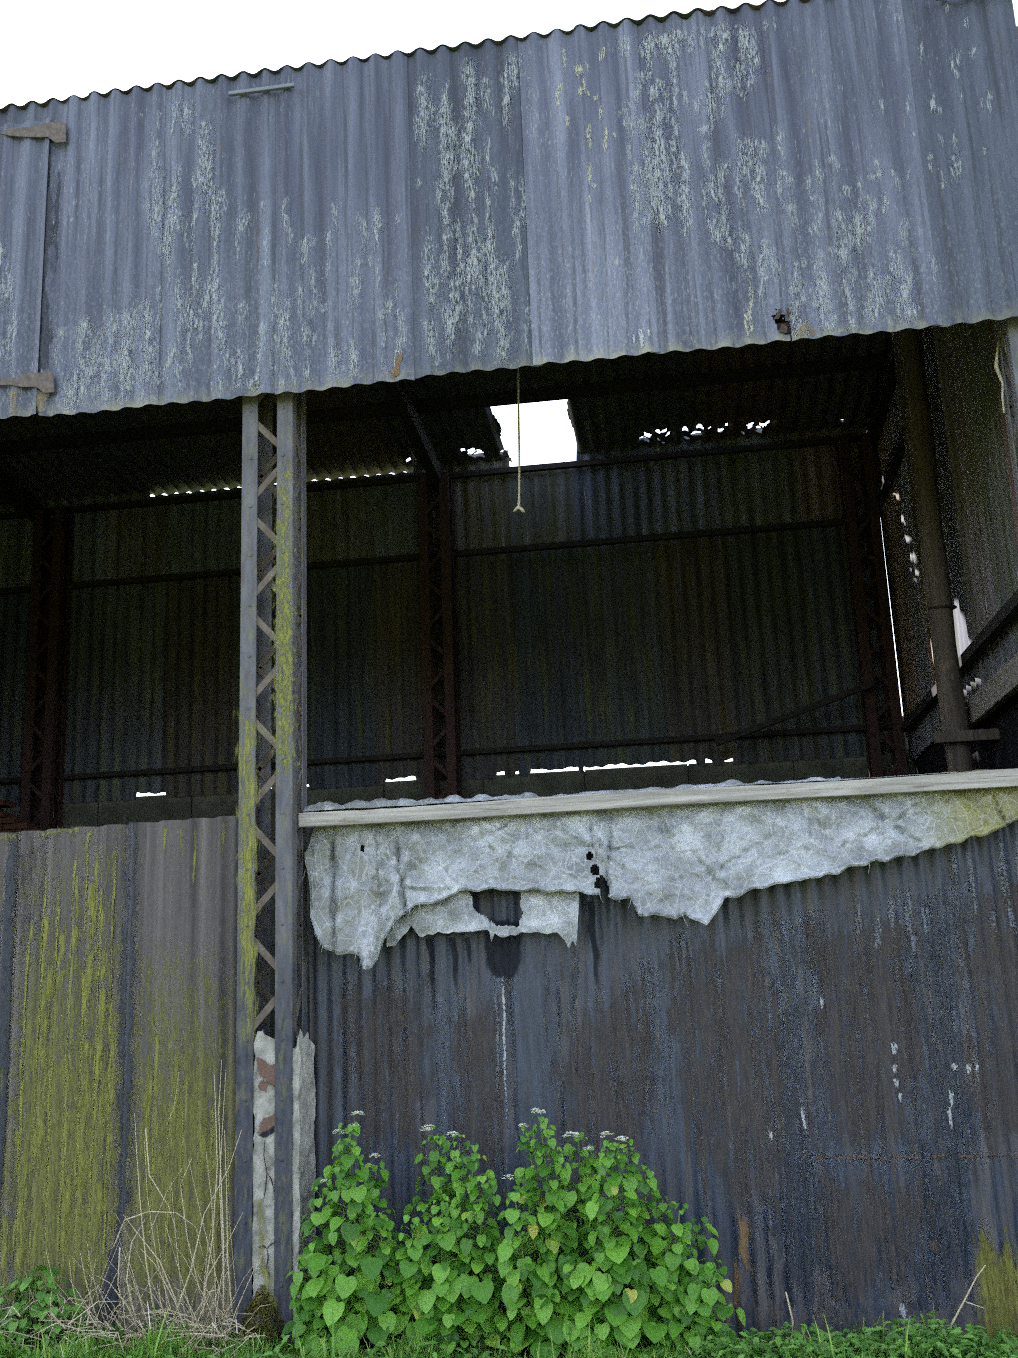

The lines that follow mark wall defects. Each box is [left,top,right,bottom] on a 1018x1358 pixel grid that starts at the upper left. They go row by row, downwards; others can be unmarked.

leakage [39,141,61,370]
leakage [0,822,187,1332]
corrosion [734,1215,753,1318]